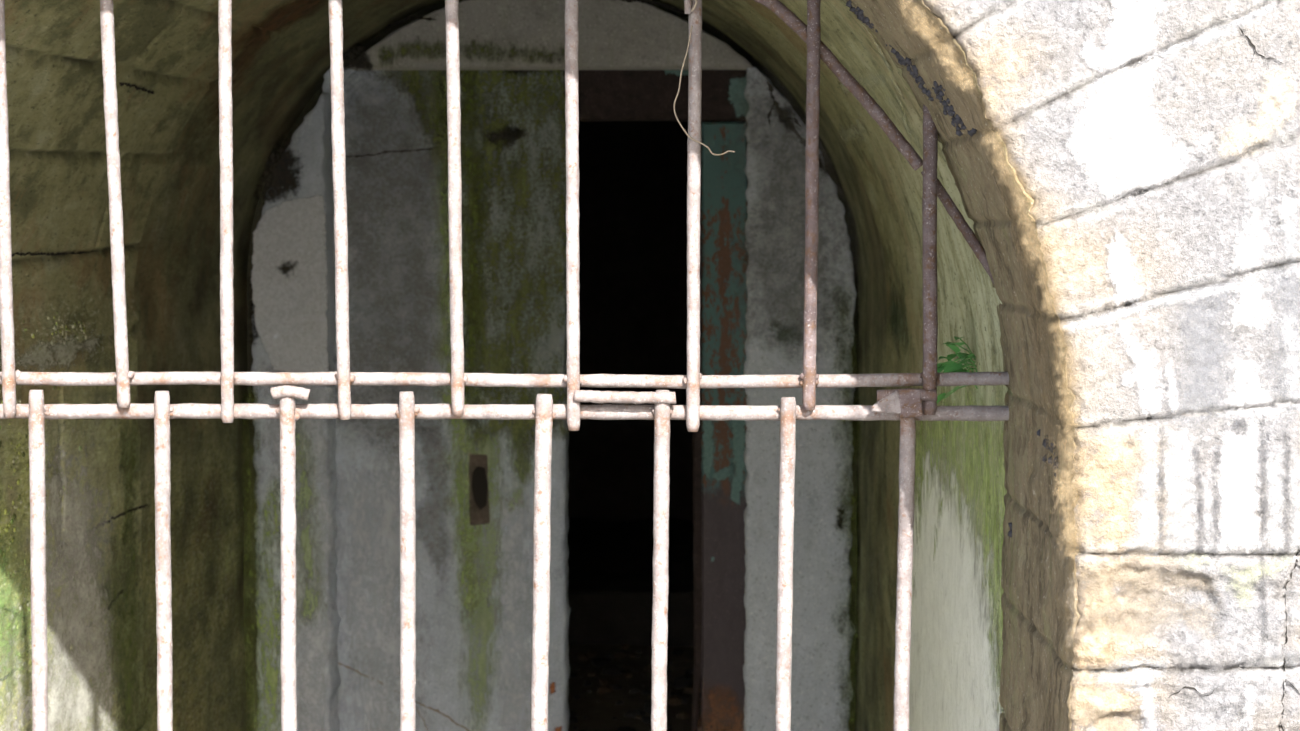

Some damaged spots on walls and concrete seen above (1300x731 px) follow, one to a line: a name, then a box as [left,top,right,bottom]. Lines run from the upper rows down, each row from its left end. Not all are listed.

leakage [1067,0,1272,200]
leakage [339,71,532,731]
leakage [1065,69,1300,627]
leakage [0,444,116,731]
corrosion [701,685,744,731]
leakage [1237,684,1255,731]
crack [1279,547,1300,731]